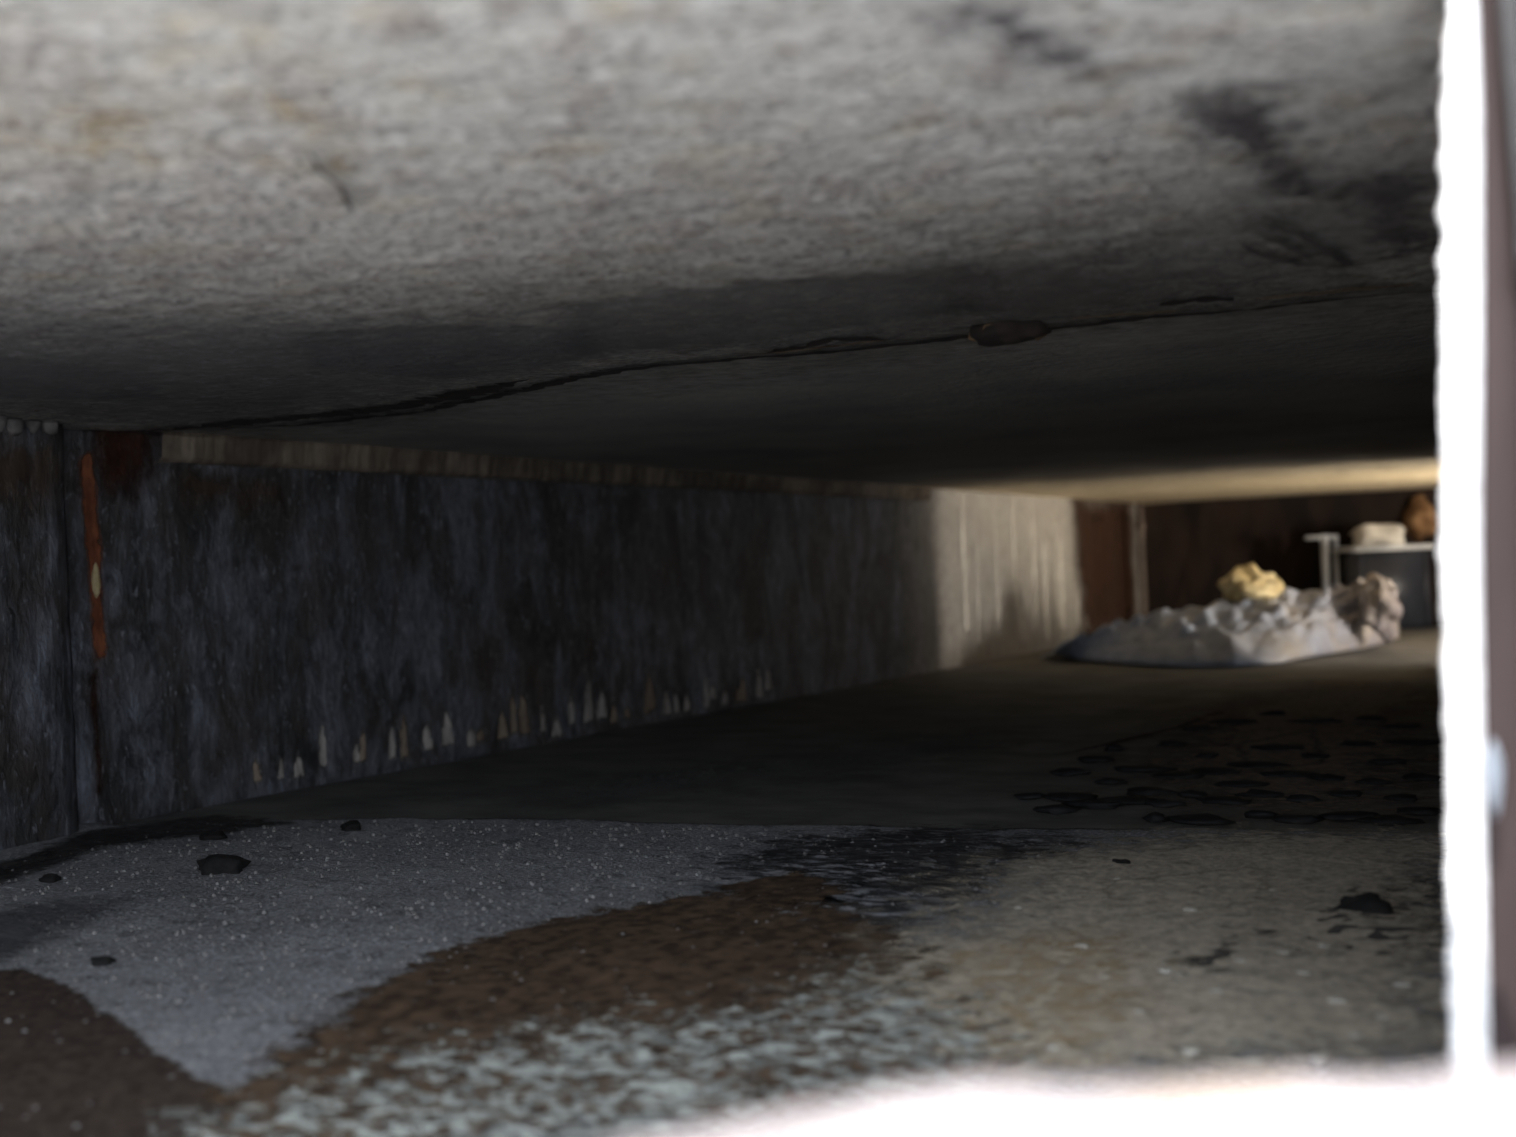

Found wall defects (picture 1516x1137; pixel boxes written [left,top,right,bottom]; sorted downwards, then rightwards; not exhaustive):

damp [1178,83,1445,260]
crack [135,335,969,433]
crack [1049,282,1441,330]
corrosion [78,430,160,793]